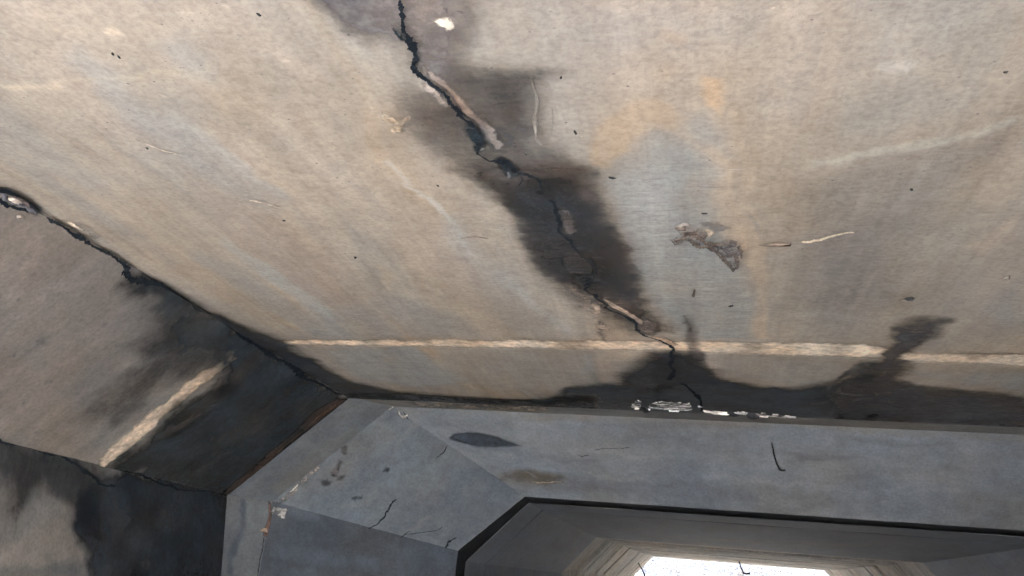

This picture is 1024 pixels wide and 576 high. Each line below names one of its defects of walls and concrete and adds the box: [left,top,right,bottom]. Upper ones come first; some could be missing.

crack [0,187,342,395]
crack [368,499,457,548]
peeling [421,69,519,179]
damp [315,0,663,339]
damp [0,274,1024,576]
crack [392,0,703,412]